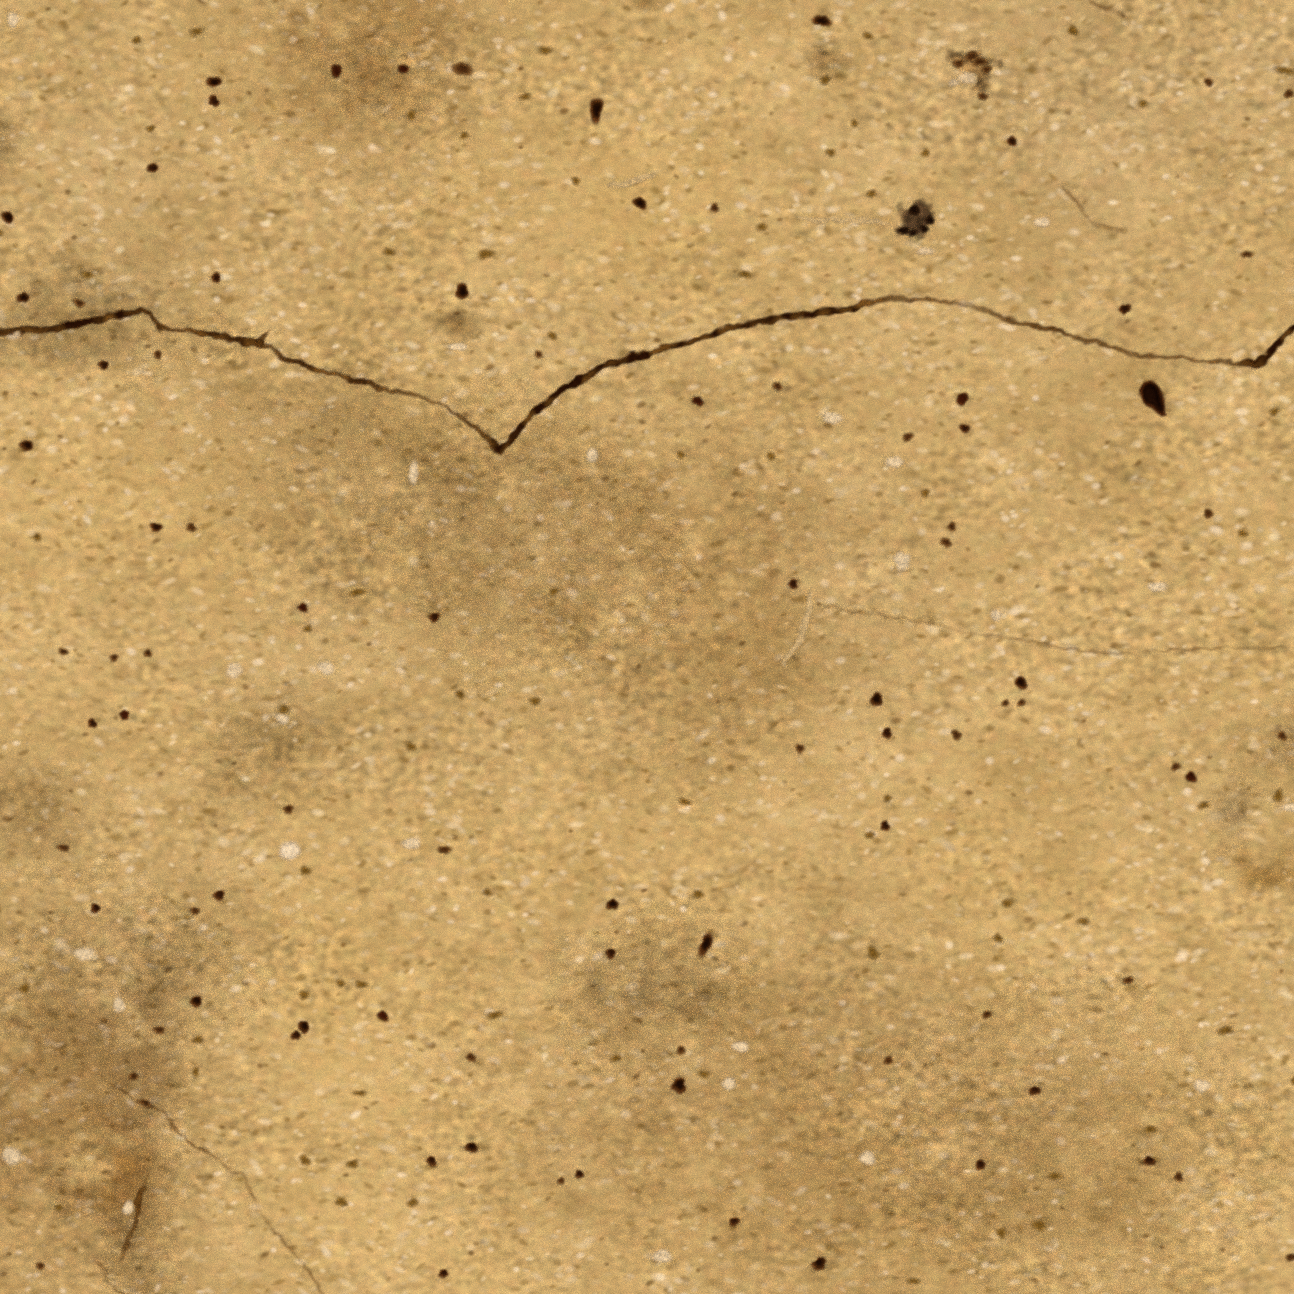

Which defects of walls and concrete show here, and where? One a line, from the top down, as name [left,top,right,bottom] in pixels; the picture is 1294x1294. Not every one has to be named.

crack [0,296,1294,454]